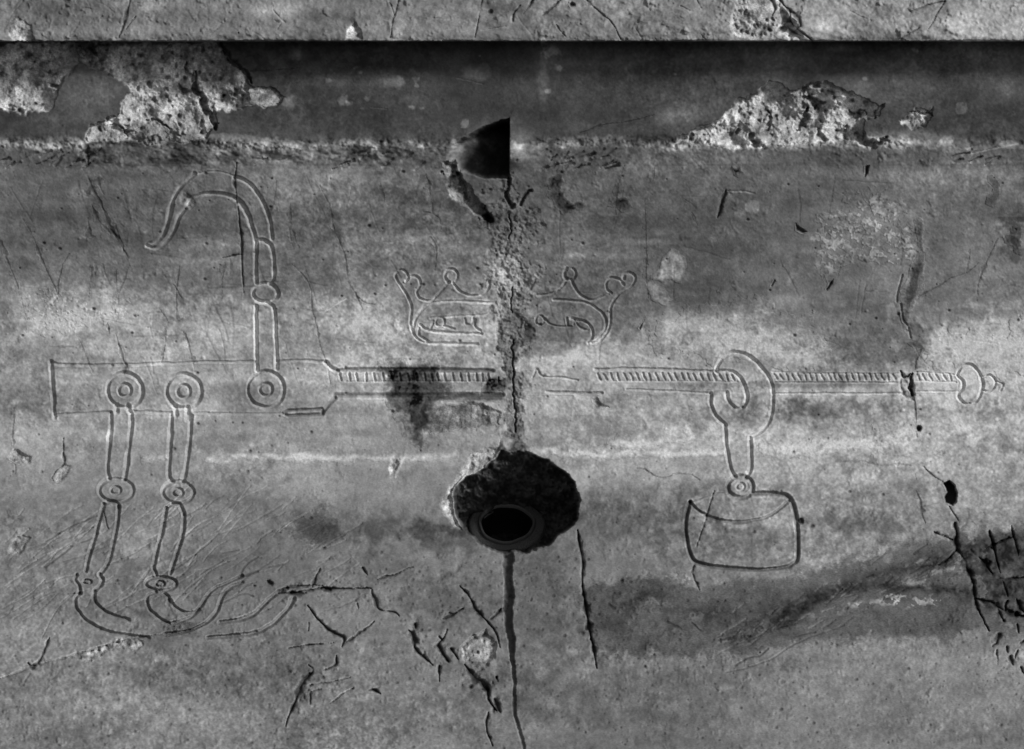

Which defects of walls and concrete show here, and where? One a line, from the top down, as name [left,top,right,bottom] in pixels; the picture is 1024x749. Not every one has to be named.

spalling [0,16,286,147]
spalling [674,80,893,152]
spalling [441,159,486,216]
crack [913,349,923,370]
damp [204,353,507,479]
crack [911,397,919,425]
crack [840,446,960,538]
crack [575,529,598,669]
crack [277,565,503,747]
crack [990,635,1024,674]